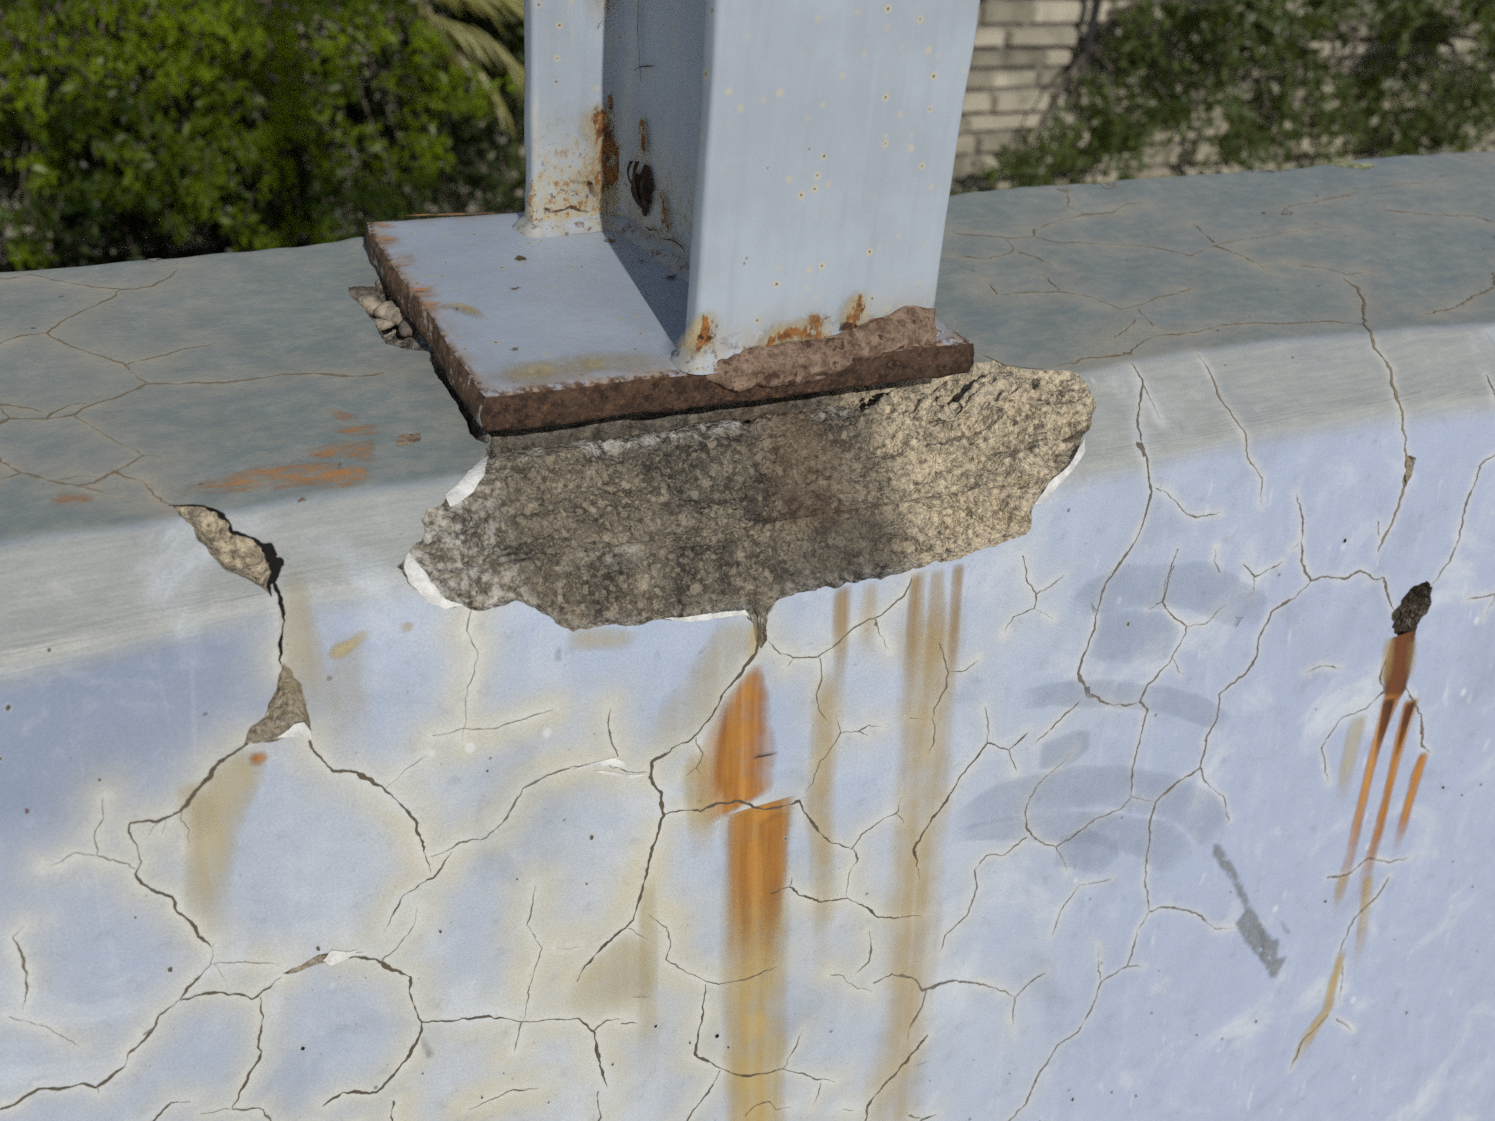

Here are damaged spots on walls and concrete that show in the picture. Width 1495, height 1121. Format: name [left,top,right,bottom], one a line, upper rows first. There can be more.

rust [586,95,646,219]
crack [0,269,384,507]
spalling [170,504,284,596]
crack [271,581,285,672]
spalling [244,662,312,745]
rust [688,314,718,354]
spalling [396,305,1096,649]
rust [764,314,827,347]
crack [308,181,1495,1121]
rust [1344,631,1426,856]
crack [0,743,280,1121]
rust [714,672,783,1121]